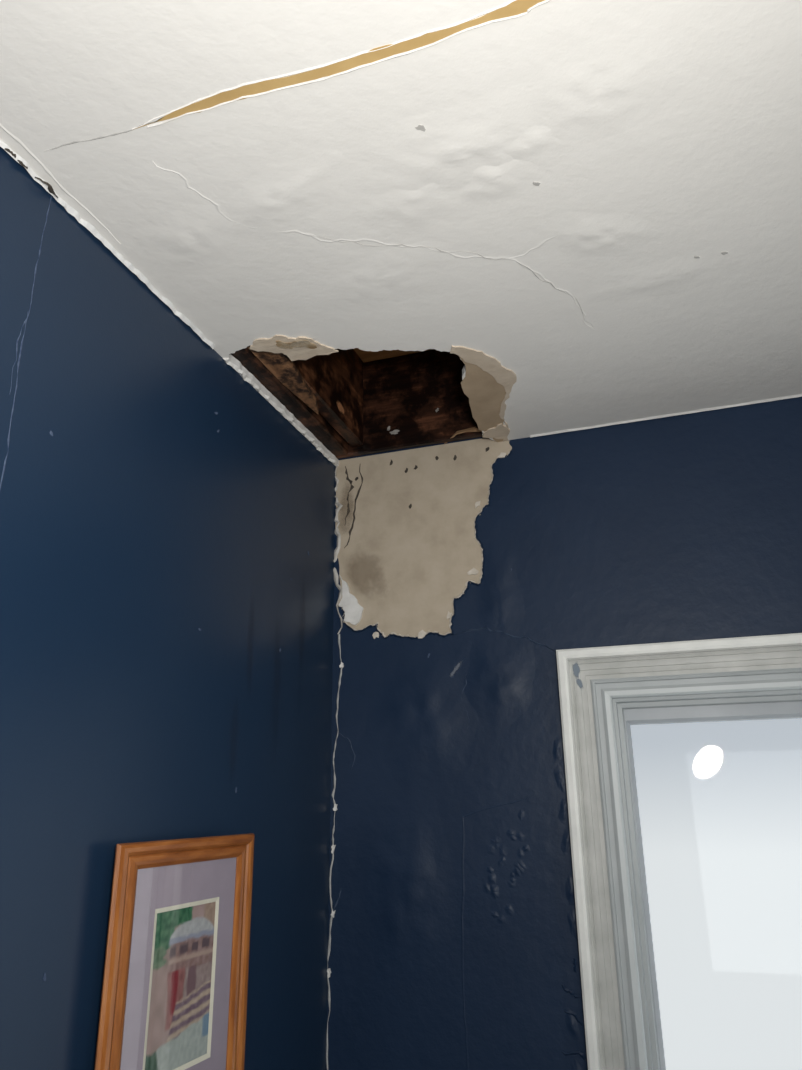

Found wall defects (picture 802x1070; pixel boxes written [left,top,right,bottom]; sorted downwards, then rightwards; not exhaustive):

crack [0,0,594,548]
peeling [333,438,512,640]
crack [326,634,356,1070]